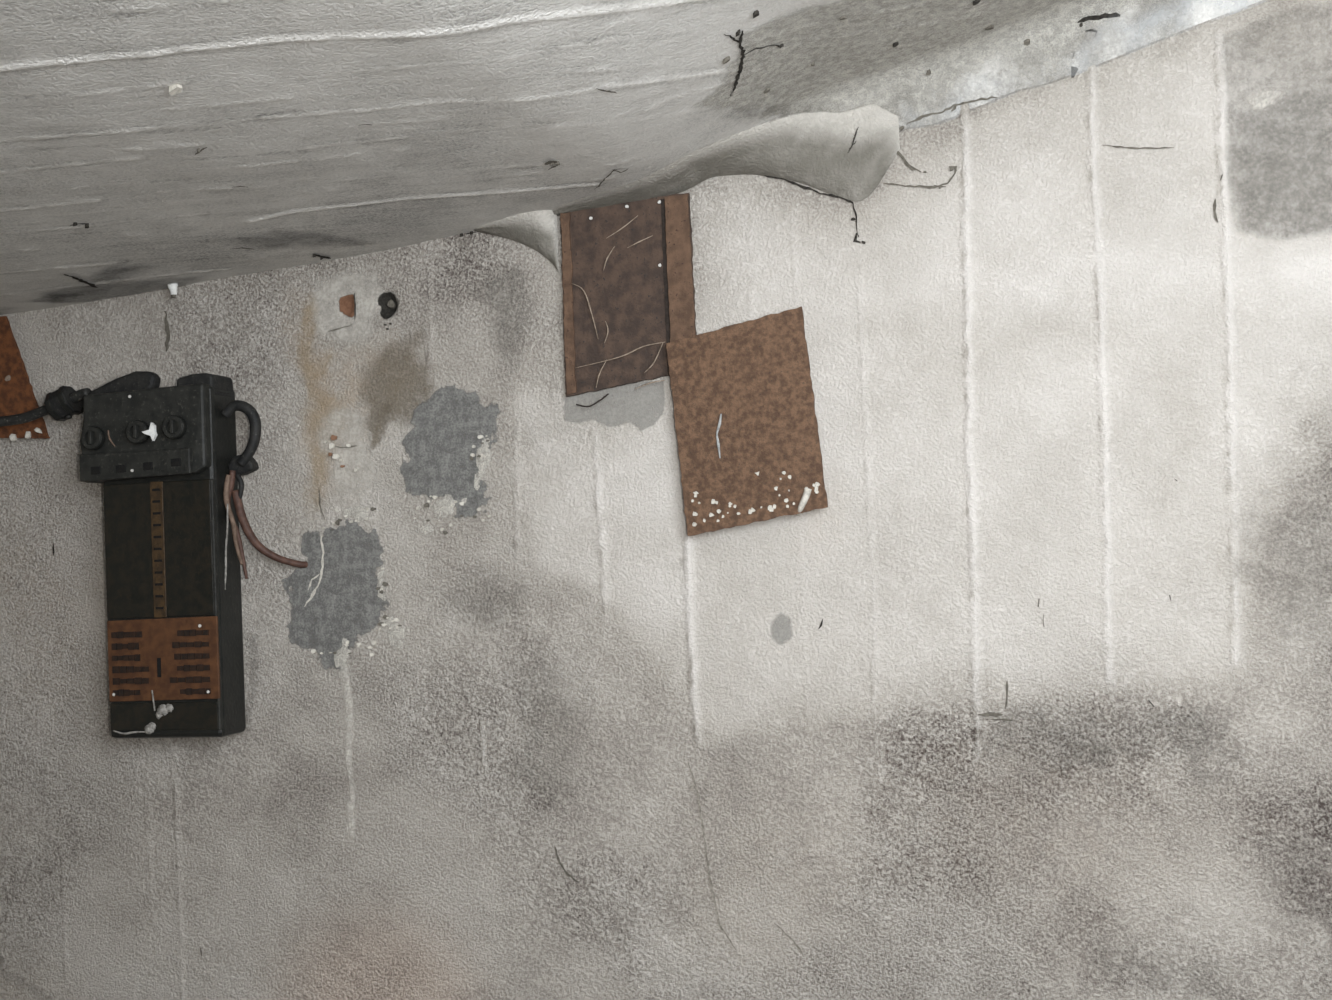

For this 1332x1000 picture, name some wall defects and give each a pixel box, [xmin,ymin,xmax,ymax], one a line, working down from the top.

crack [724,29,784,96]
crack [884,96,997,189]
crack [756,174,866,244]
peeling [322,410,374,488]
peeling [400,385,500,535]
peeling [282,490,406,670]
water stain [772,615,792,643]